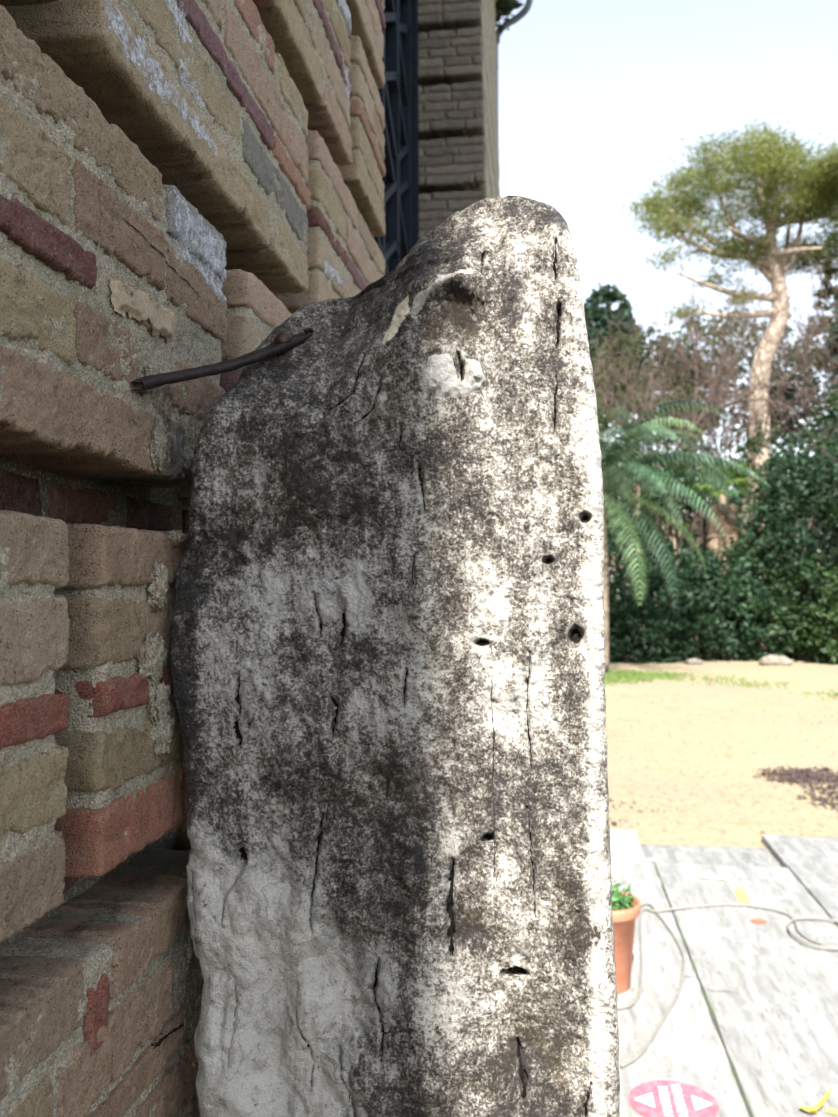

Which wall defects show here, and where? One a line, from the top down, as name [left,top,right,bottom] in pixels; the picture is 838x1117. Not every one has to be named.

peeling [382,295,410,345]
crack [554,309,562,348]
crack [551,379,559,433]
crack [446,859,455,956]
crack [517,1037,527,1098]